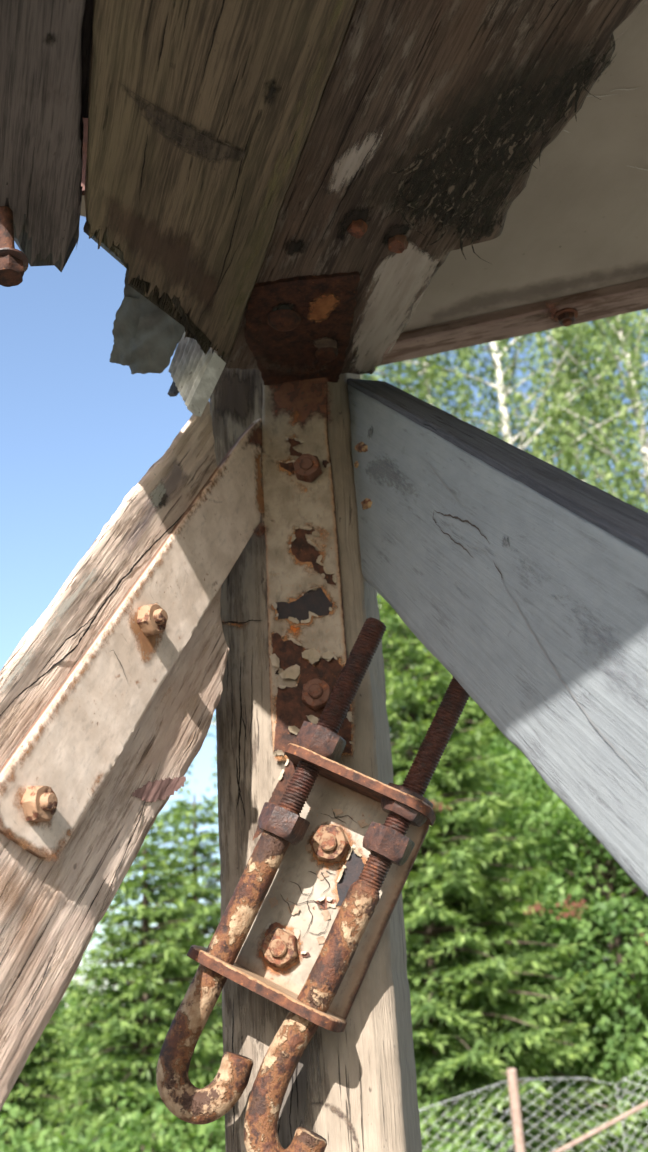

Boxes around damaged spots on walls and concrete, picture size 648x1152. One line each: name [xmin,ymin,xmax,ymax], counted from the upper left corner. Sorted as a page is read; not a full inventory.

rust [309,294,339,322]
rust [269,377,332,429]
rust [4,654,95,807]
crack [0,513,184,716]
crack [222,620,261,816]
peeling [268,527,345,806]
peeling [337,704,355,757]
crack [429,464,648,788]
crack [0,714,204,1024]
rust [257,925,302,975]
crack [269,809,369,944]
rust [308,823,353,869]